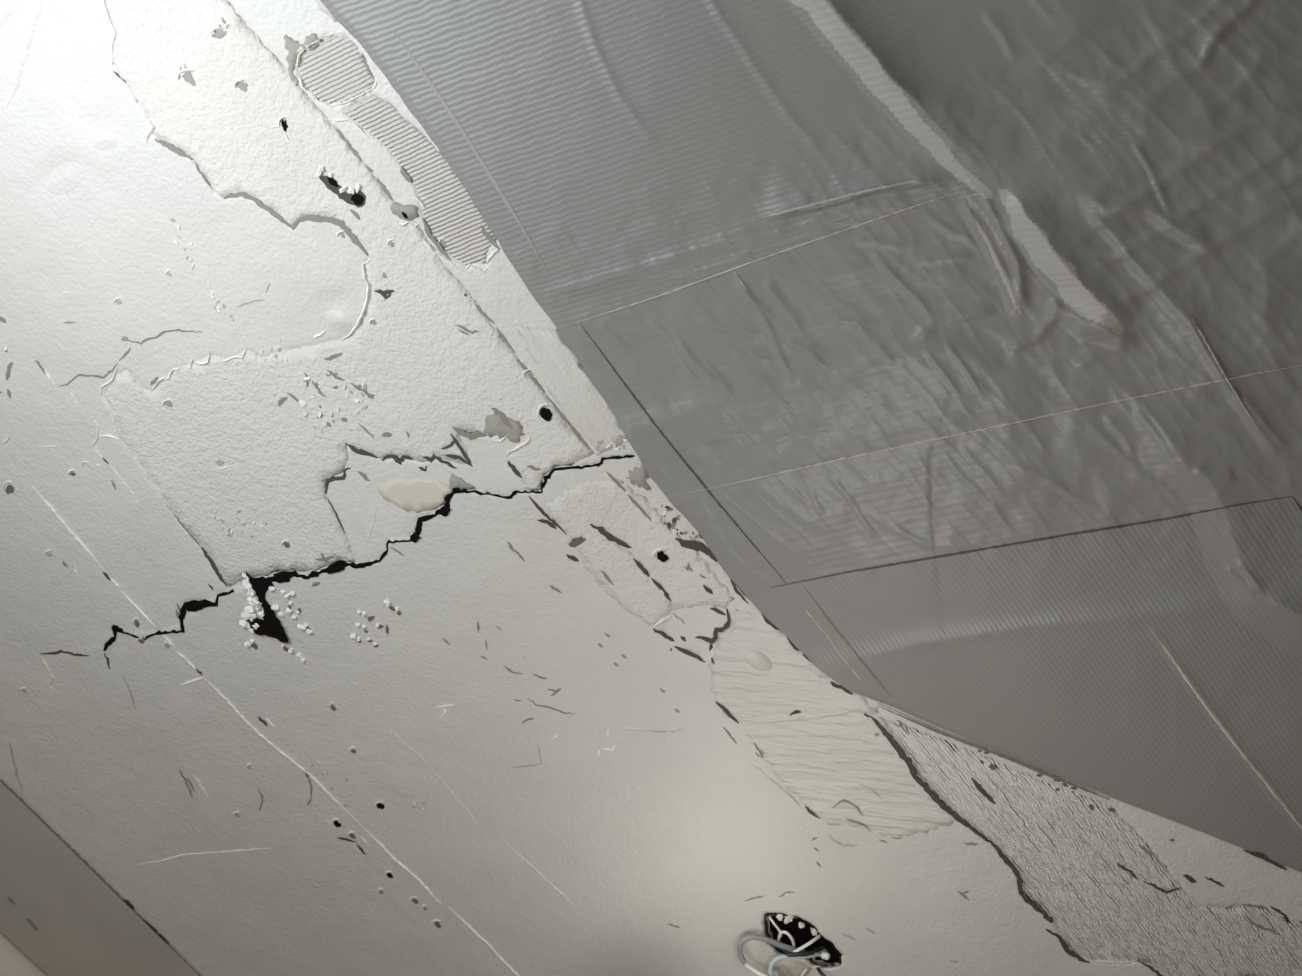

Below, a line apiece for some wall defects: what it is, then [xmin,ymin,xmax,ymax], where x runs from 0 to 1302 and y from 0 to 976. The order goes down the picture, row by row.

flaking render [93,0,735,652]
crack [41,515,234,709]
crack [178,769,195,797]
crack [265,353,1090,963]
flaking render [875,719,1302,976]